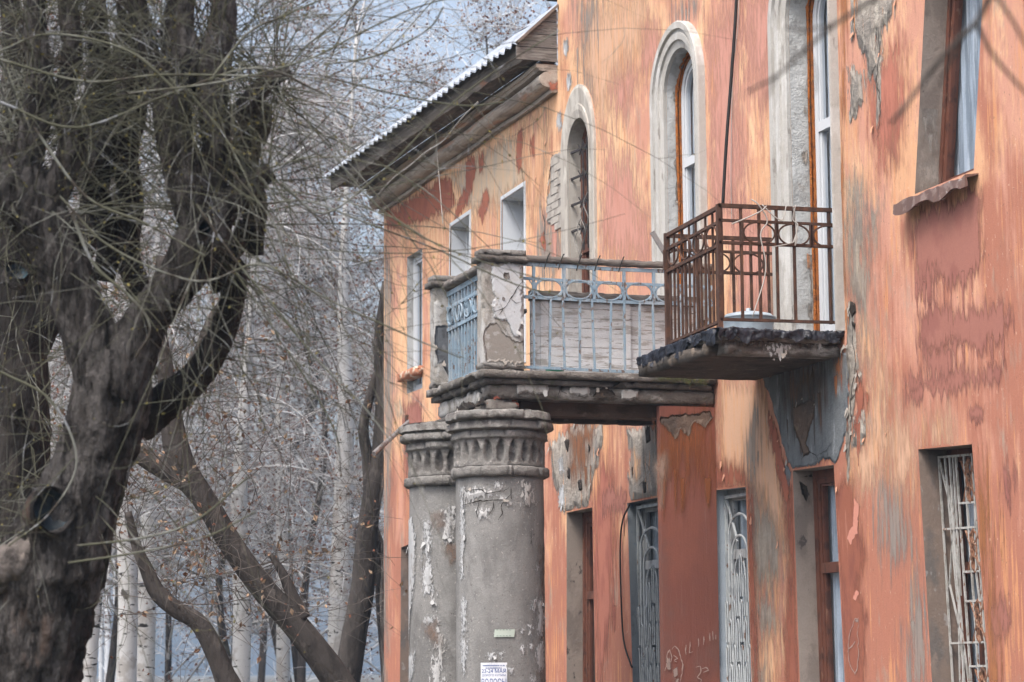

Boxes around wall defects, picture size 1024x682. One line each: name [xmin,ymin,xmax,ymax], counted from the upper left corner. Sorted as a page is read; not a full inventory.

peeling [846,0,908,171]
peeling [483,262,524,365]
peeling [835,170,914,545]
damp [905,184,1014,406]
peeling [406,479,538,682]
peeling [520,597,546,682]
flaking render [546,424,603,513]
peeling [626,379,815,682]